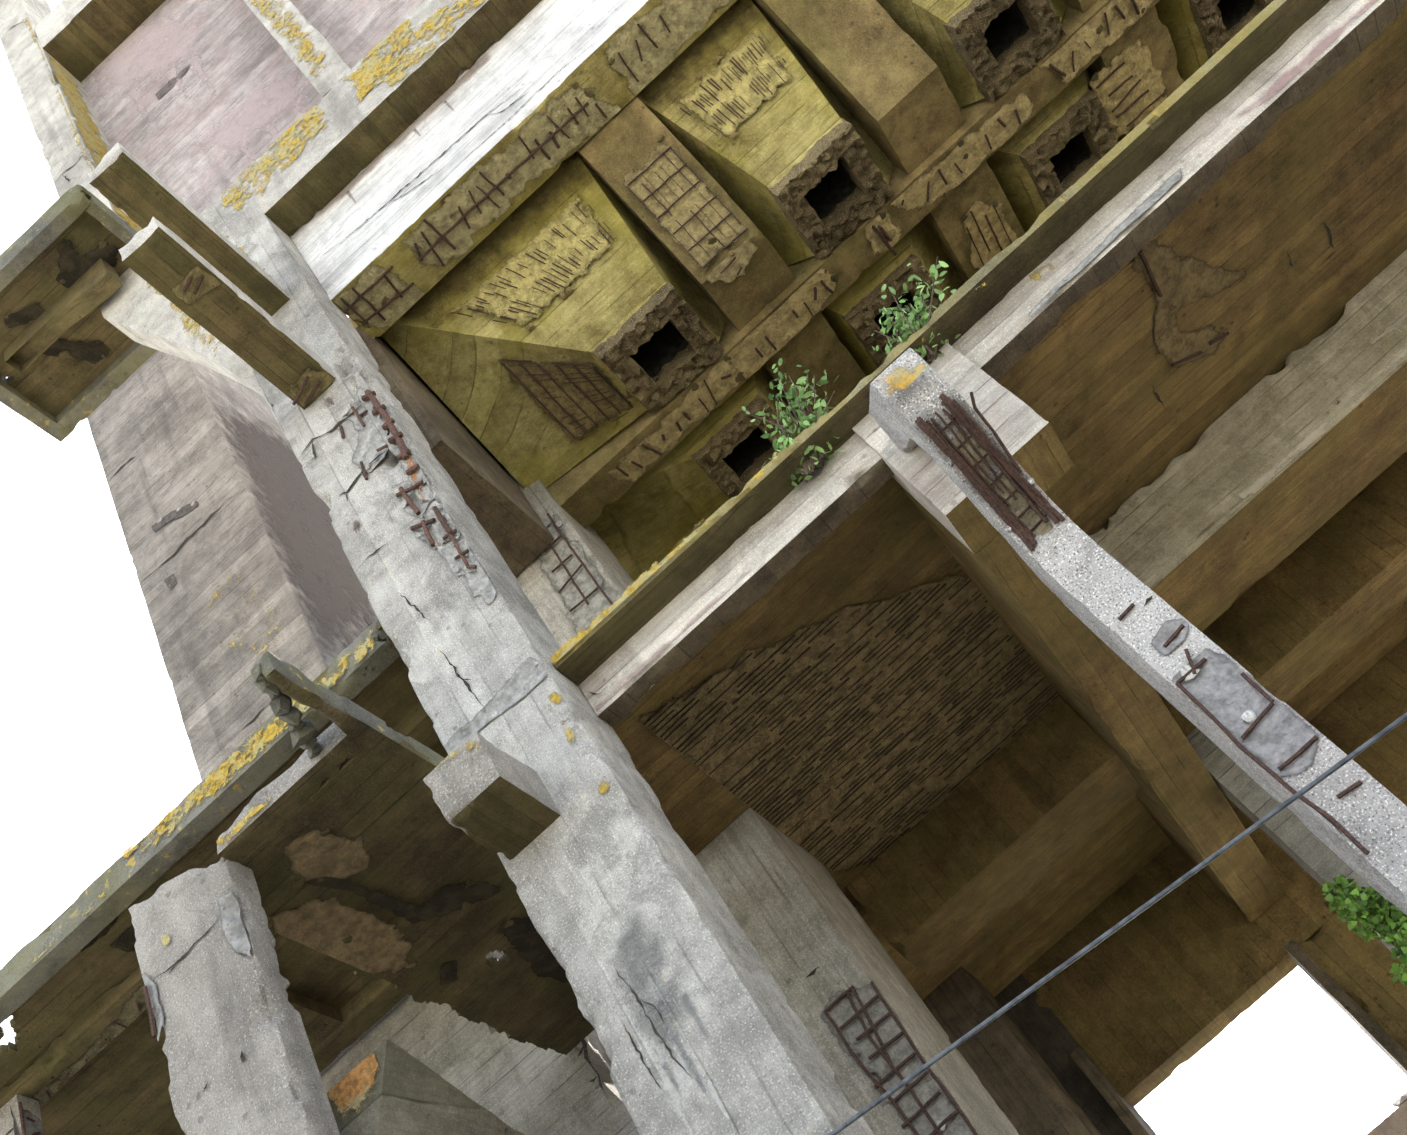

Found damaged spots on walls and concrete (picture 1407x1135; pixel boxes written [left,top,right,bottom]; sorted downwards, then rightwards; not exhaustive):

spalling [605,0,730,96]
spalling [334,82,621,331]
spalling [624,134,758,284]
spalling [498,359,635,441]
spalling [606,268,839,483]
spalling [915,392,1065,552]
spalling [1151,619,1369,855]
crack [611,963,701,1096]
spalling [821,981,978,1135]